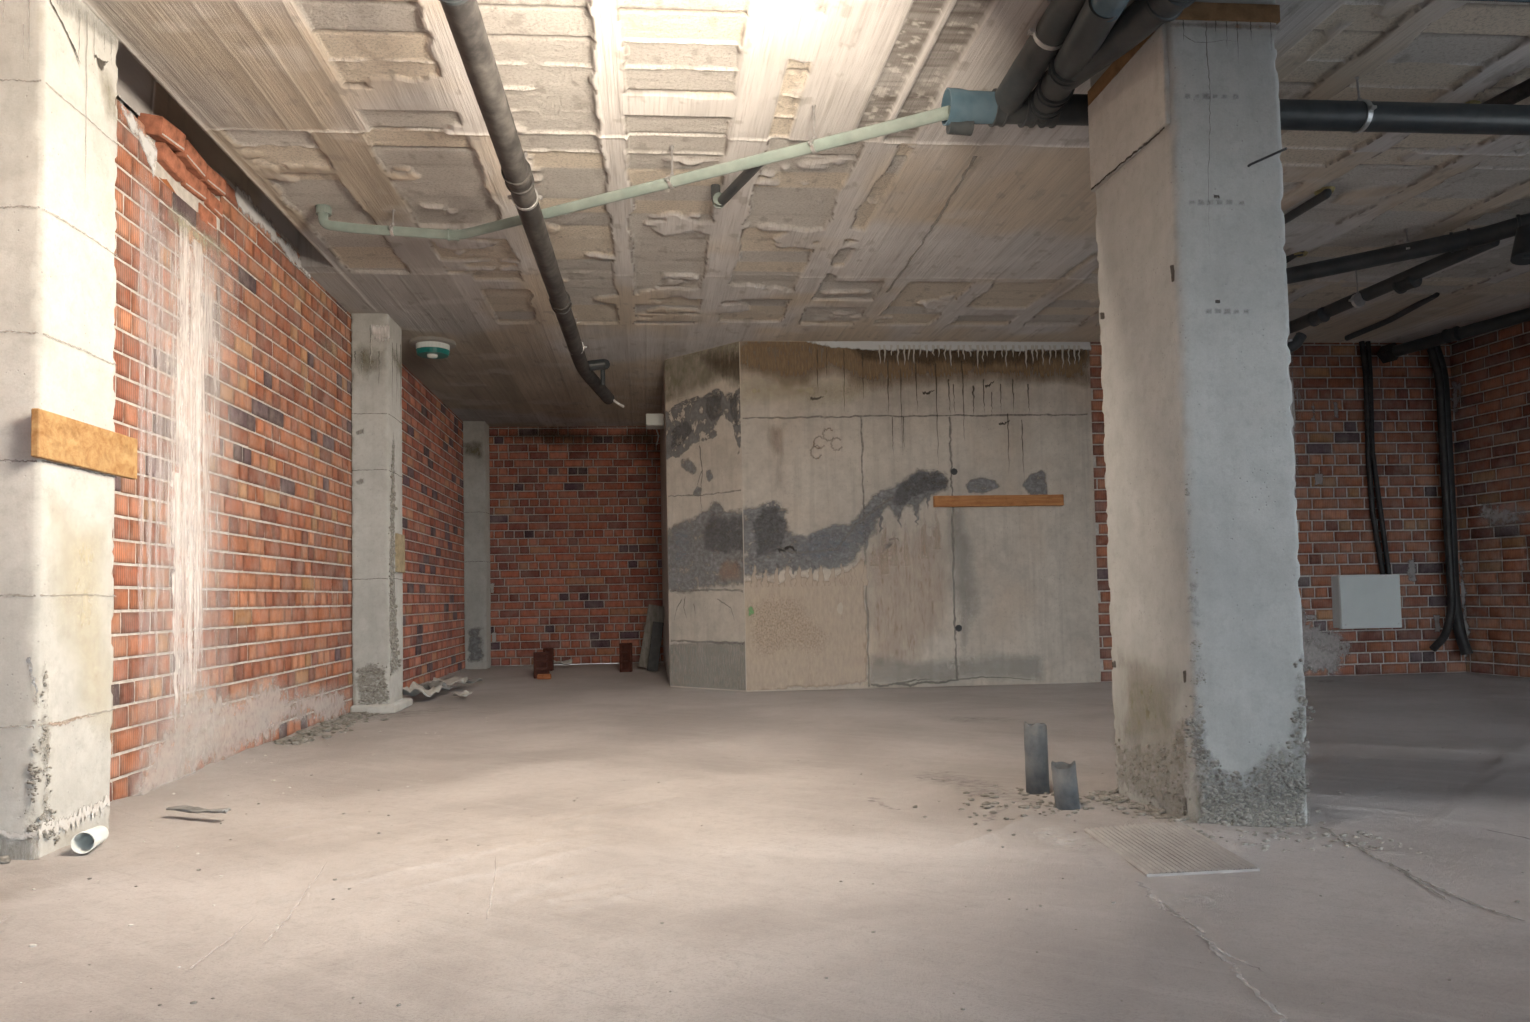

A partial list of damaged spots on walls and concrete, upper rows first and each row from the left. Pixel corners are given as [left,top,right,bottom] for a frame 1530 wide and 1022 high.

leakage [665,341,1091,495]
leakage [143,220,344,795]
leakage [1302,609,1350,672]
spalling [24,671,61,844]
spalling [1114,640,1321,827]
crack [1320,827,1525,921]